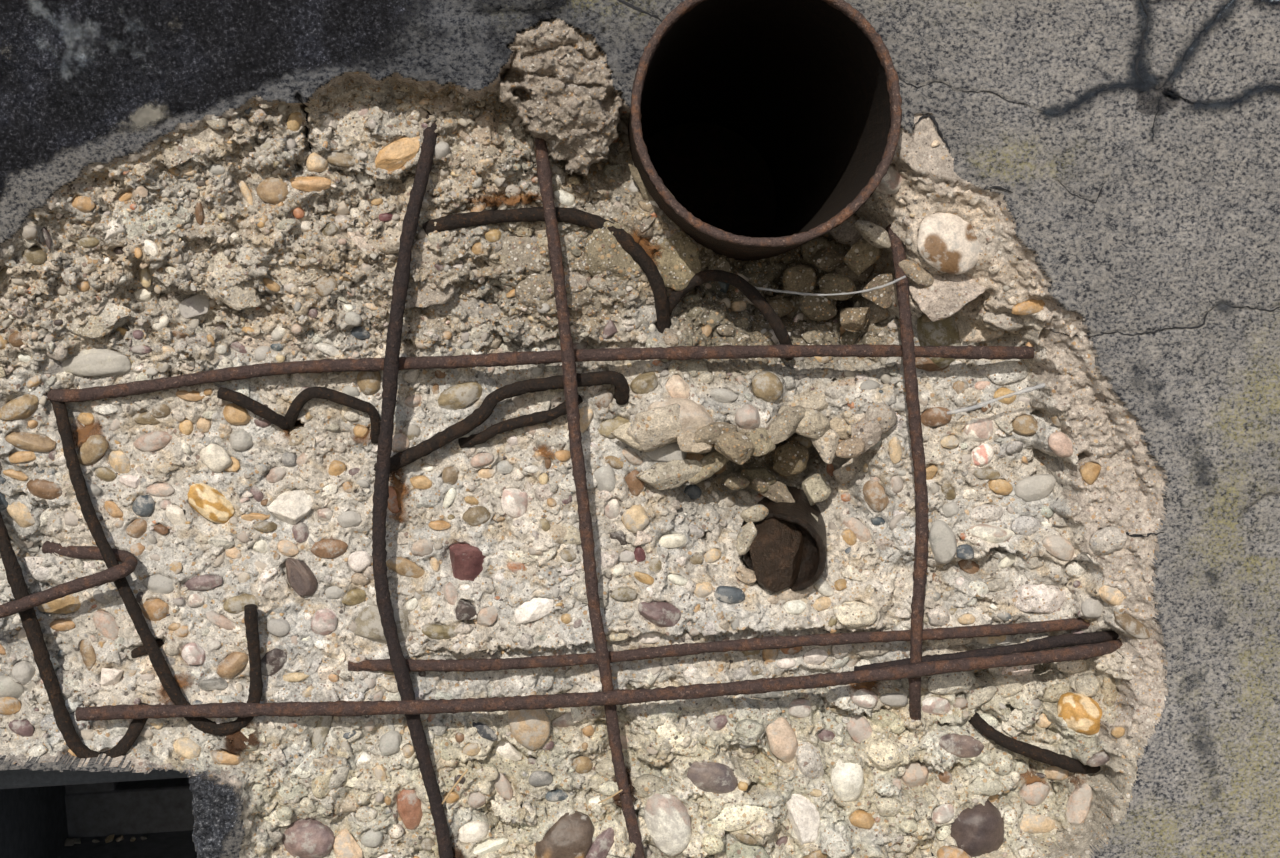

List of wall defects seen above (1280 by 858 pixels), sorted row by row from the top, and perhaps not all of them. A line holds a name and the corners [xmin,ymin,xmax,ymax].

crack [900,0,1280,153]
leakage [0,0,446,200]
crack [1050,306,1280,337]
corrosion [71,420,102,447]
spalling [0,50,561,858]
corrosion [389,469,409,524]
spalling [385,101,1168,858]
corrosion [850,681,879,693]
corrosion [224,722,260,755]
corrosion [613,766,638,808]
corrosion [1020,767,1046,785]
corrosion [450,834,465,858]